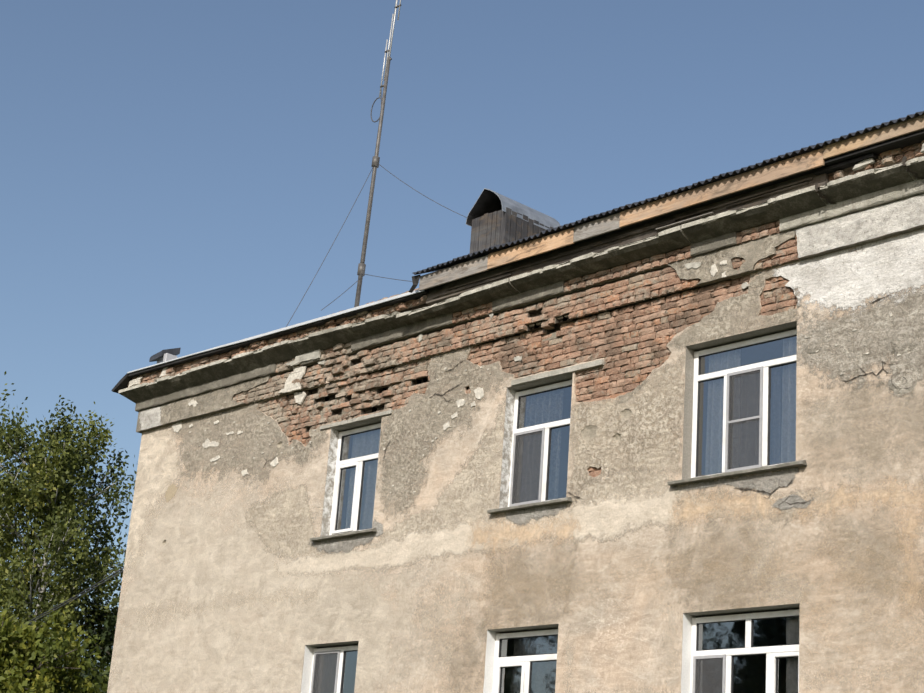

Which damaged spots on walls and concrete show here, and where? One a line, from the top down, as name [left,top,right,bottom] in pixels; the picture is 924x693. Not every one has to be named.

flaking render [124,194,924,573]